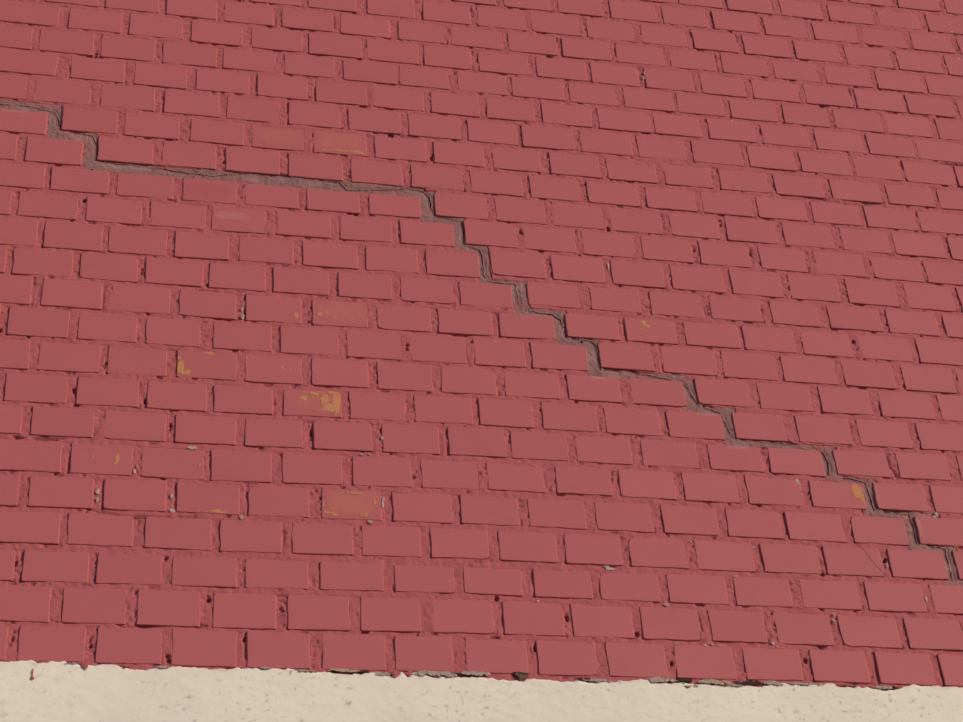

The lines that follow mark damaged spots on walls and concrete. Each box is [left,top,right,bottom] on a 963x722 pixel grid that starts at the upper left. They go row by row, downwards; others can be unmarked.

peeling [299,391,341,416]
crack [0,100,963,586]